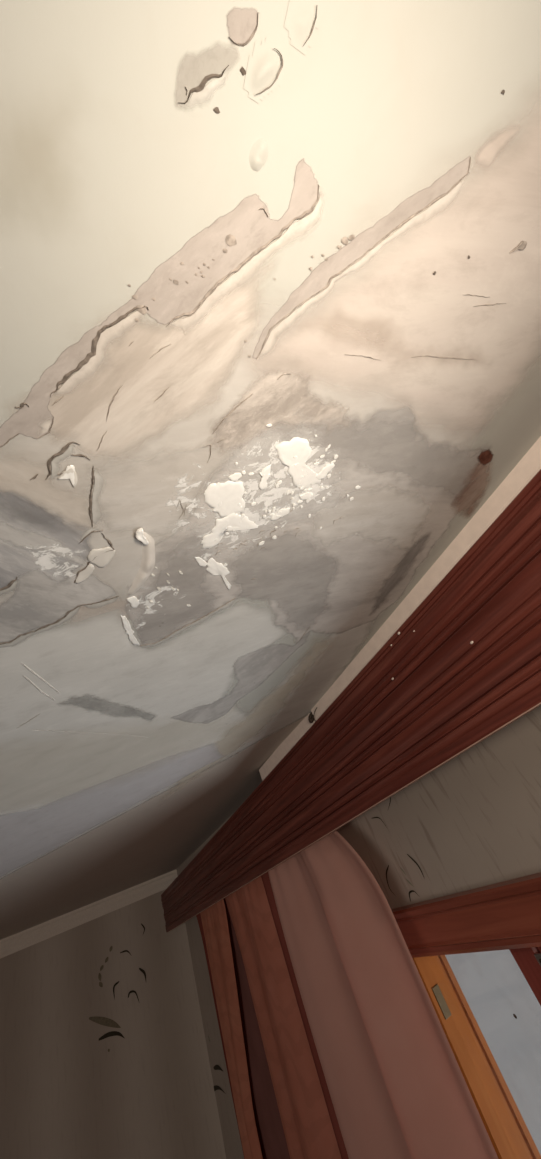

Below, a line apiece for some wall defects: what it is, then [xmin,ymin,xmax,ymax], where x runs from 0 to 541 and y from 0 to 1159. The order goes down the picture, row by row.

peeling [177,8,258,114]
peeling [0,107,541,723]
rust [454,450,493,515]
damp [0,493,91,589]
damp [374,535,428,610]
damp [0,645,325,876]